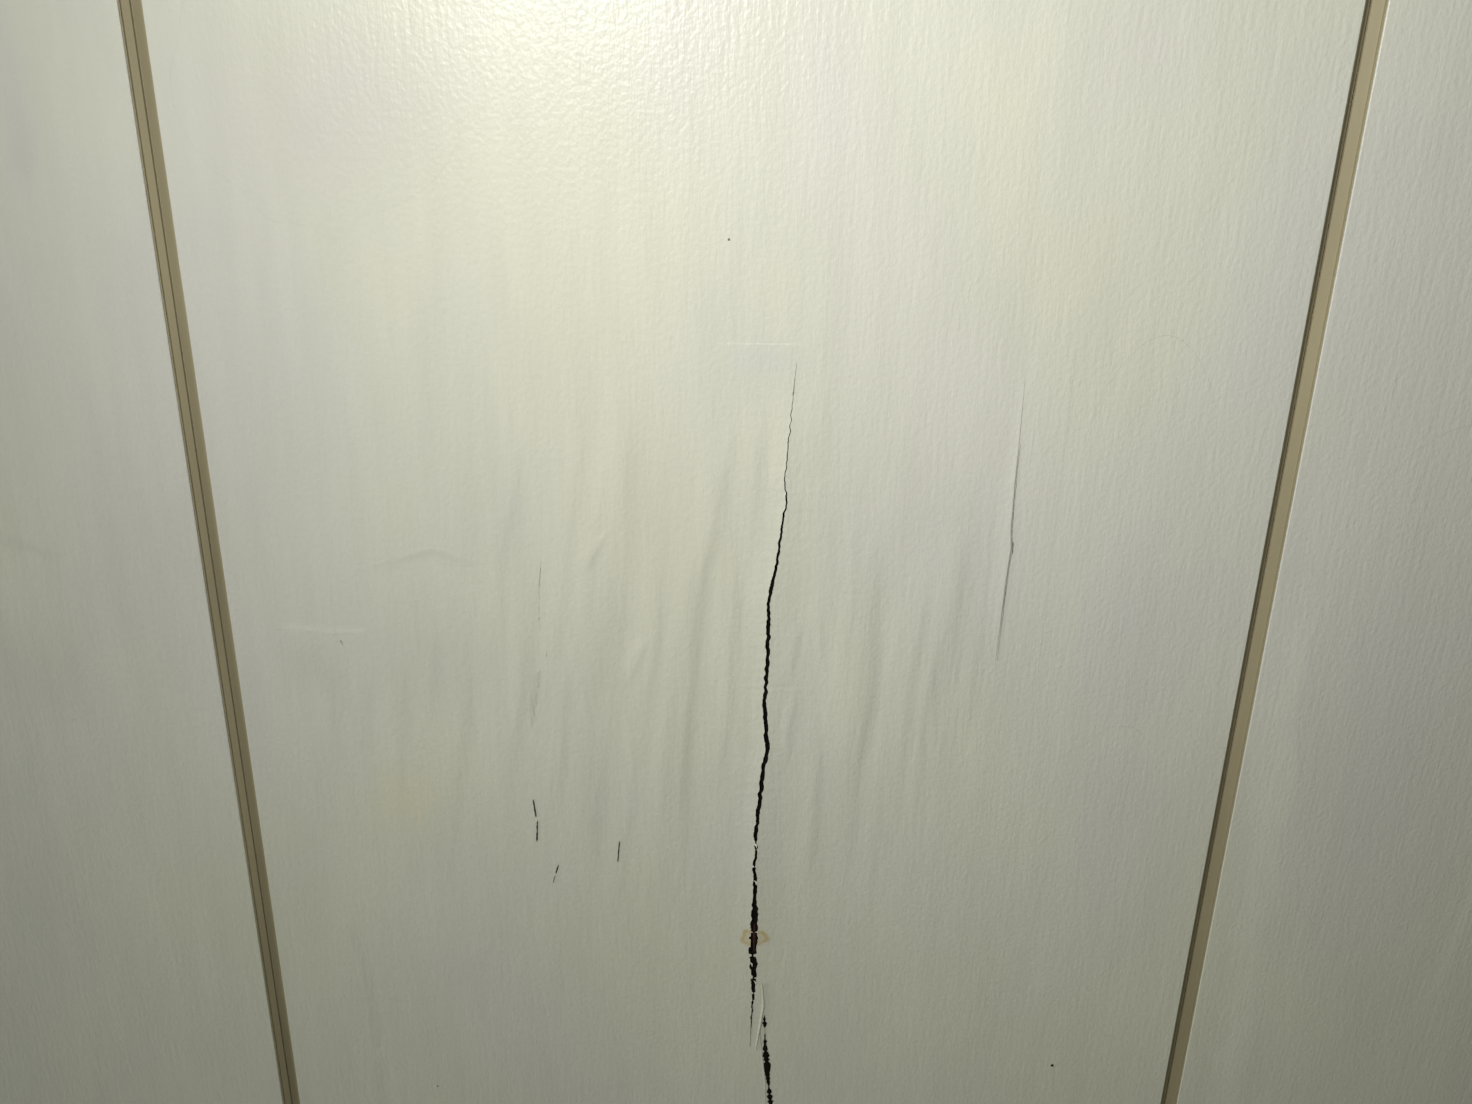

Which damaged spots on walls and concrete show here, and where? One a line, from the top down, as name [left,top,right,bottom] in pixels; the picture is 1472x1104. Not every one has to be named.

crack [748,363,797,1104]